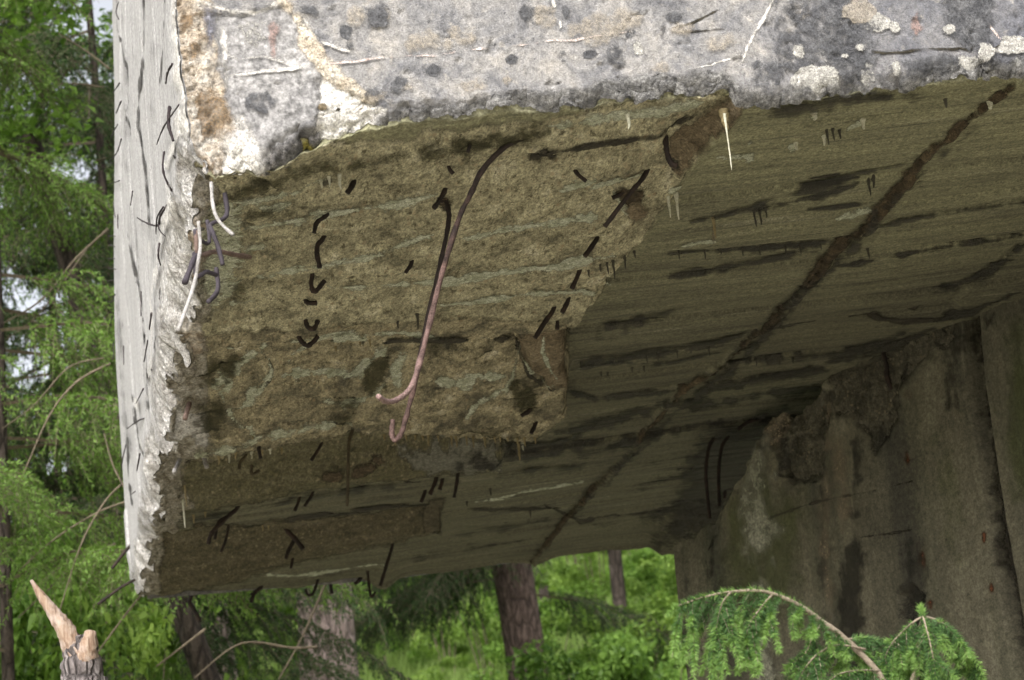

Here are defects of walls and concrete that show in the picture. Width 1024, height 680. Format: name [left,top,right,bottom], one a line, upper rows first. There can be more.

crack [529,117,694,161]
spalling [130,0,1024,596]
crack [850,305,984,363]
crack [471,504,679,524]
damp [818,435,865,670]
crack [986,393,1024,630]